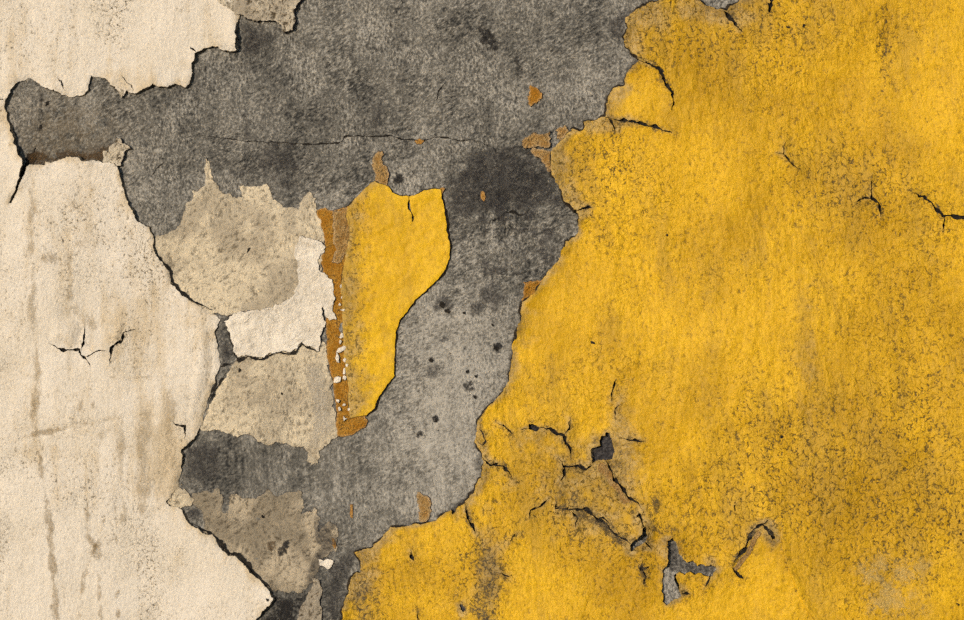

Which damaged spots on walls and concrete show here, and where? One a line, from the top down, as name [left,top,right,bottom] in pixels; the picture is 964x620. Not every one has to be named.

peeling [702,0,739,9]
crack [641,61,675,107]
crack [610,118,672,133]
crack [189,134,513,167]
crack [12,148,37,201]
crack [857,181,881,215]
crack [914,192,964,228]
peeling [6,0,658,620]
crack [54,331,128,364]
crack [478,424,651,584]
peeling [662,538,716,605]